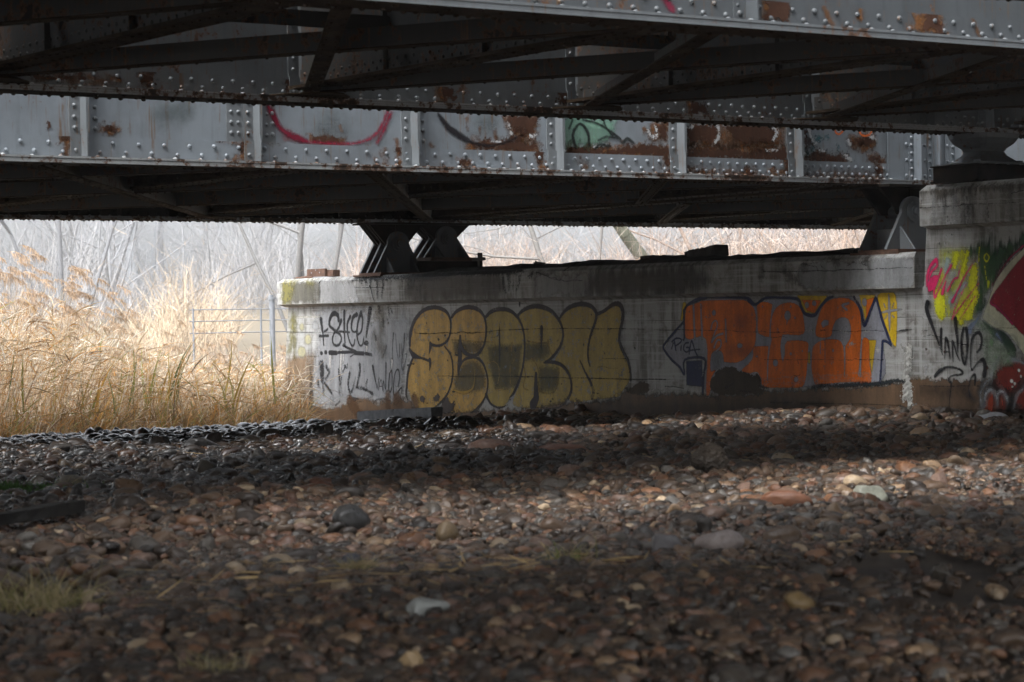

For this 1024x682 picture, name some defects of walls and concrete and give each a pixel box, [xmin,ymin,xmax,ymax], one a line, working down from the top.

rust [762,0,791,22]
rust [911,13,949,34]
rust [46,121,70,156]
rust [98,121,120,136]
water stain [281,276,418,421]
water stain [443,343,1024,417]